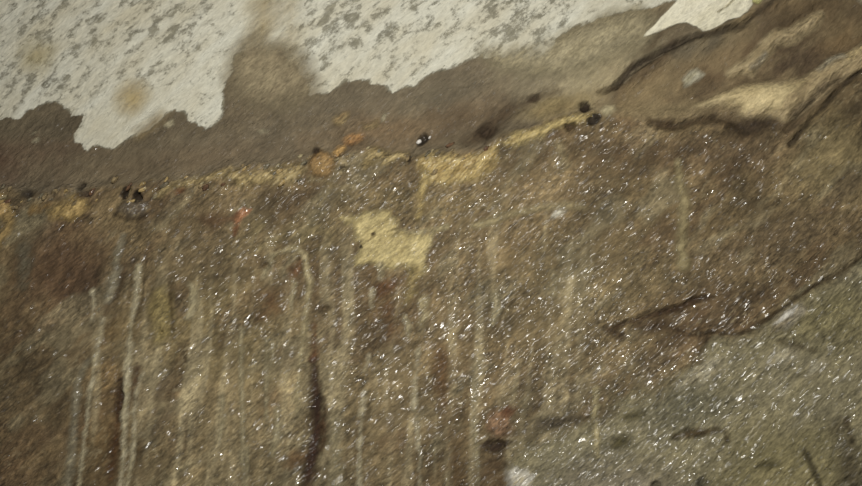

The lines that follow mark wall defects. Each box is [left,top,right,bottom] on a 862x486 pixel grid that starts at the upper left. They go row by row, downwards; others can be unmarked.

water stain [231,19,315,105]
peeling [0,0,761,151]
water stain [32,195,86,221]
water stain [65,289,104,486]
water stain [105,234,124,302]
water stain [118,263,145,486]
spalling [111,114,411,203]
water stain [261,246,313,410]
water stain [340,211,432,335]
water stain [675,160,690,270]
water stain [774,306,806,329]
water stain [507,467,534,486]